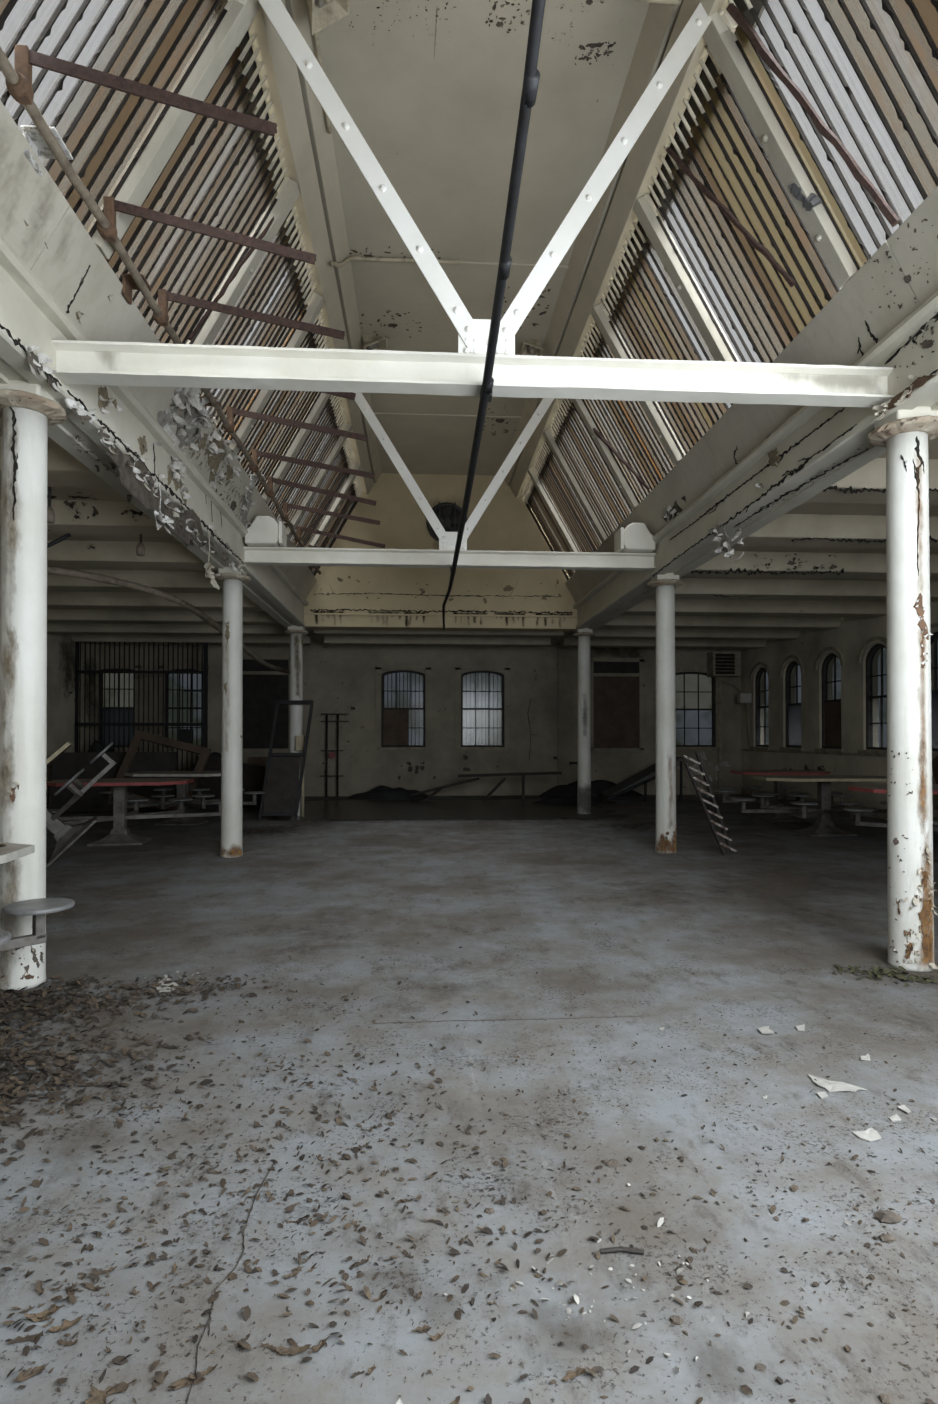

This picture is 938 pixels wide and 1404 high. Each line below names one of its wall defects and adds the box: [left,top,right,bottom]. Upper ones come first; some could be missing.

peeling [485,0,616,65]
peeling [864,219,938,309]
peeling [871,317,935,420]
peeling [24,344,257,590]
peeling [706,521,837,575]
peeling [913,593,933,668]
spalling [889,835,938,969]
rust [921,854,934,965]
crack [186,1163,274,1404]